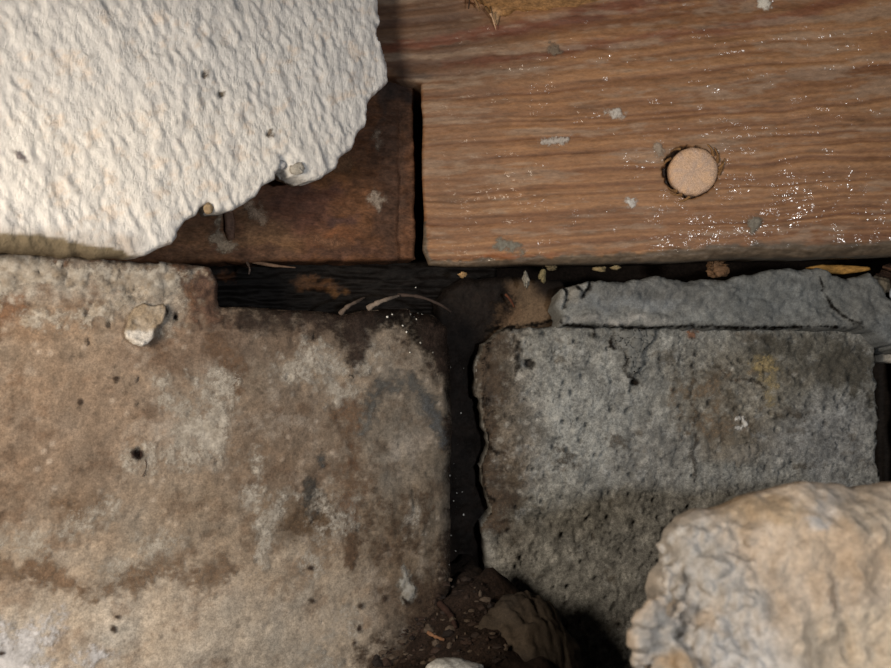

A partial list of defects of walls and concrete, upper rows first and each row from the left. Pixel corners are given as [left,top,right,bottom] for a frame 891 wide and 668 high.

water stain [120,368,240,475]
water stain [233,277,519,668]
crack [481,278,853,515]
water stain [0,529,236,604]
water stain [0,605,66,668]